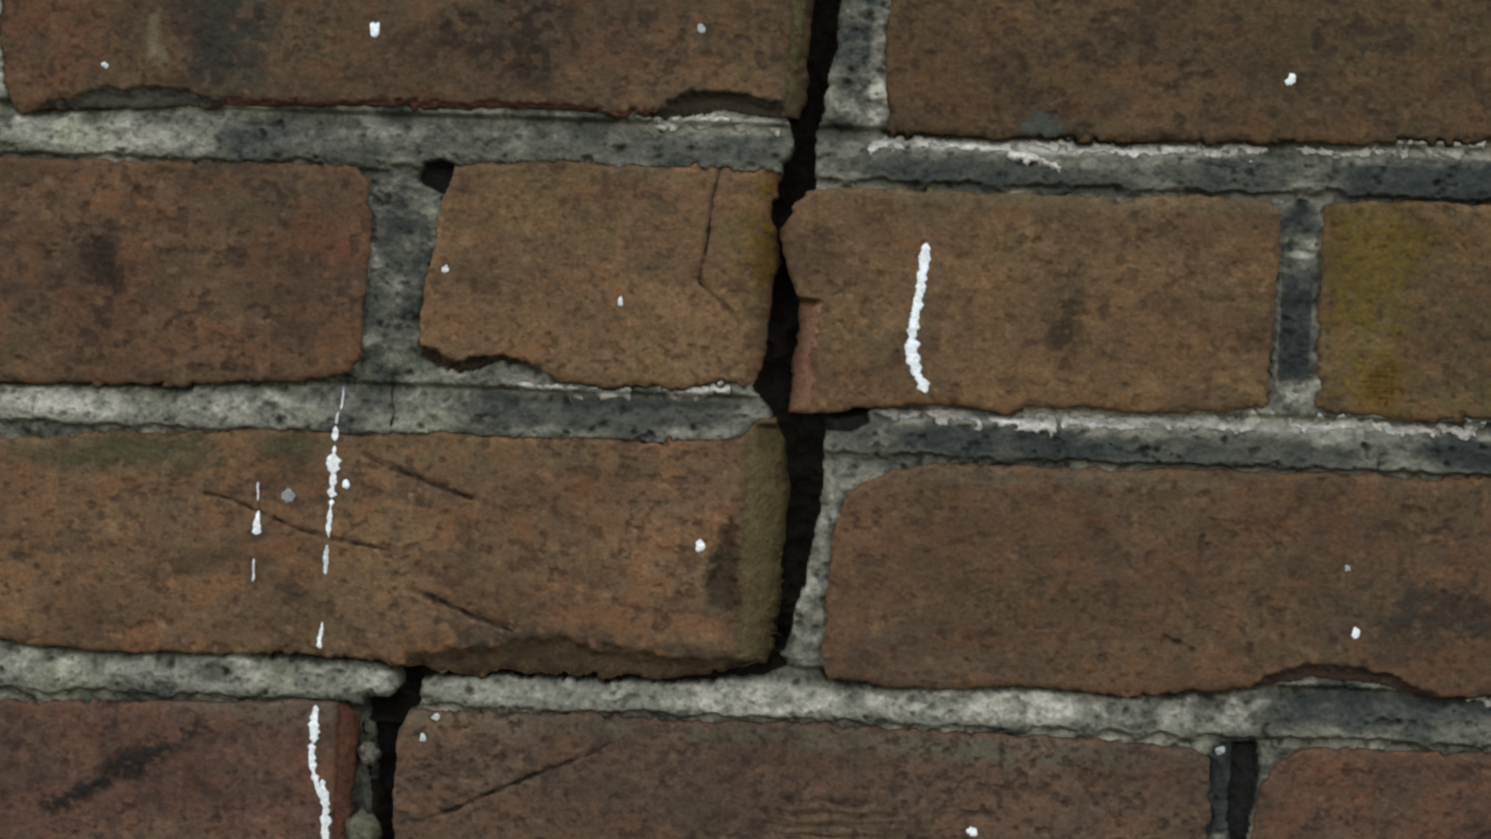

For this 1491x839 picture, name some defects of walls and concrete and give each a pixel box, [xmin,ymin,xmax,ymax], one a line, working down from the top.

crack [362,0,841,839]